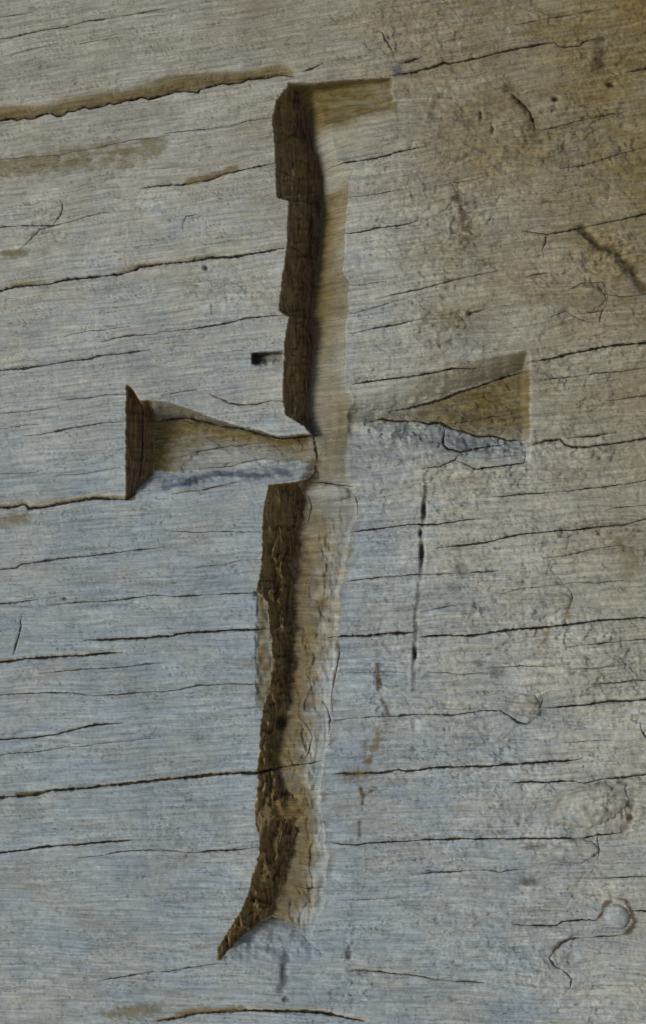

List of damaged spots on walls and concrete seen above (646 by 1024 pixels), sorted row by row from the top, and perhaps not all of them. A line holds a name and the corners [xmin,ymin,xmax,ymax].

crack [0,245,311,292]
crack [346,213,646,470]
crack [0,390,646,558]
crack [0,570,646,799]
crack [513,911,622,994]